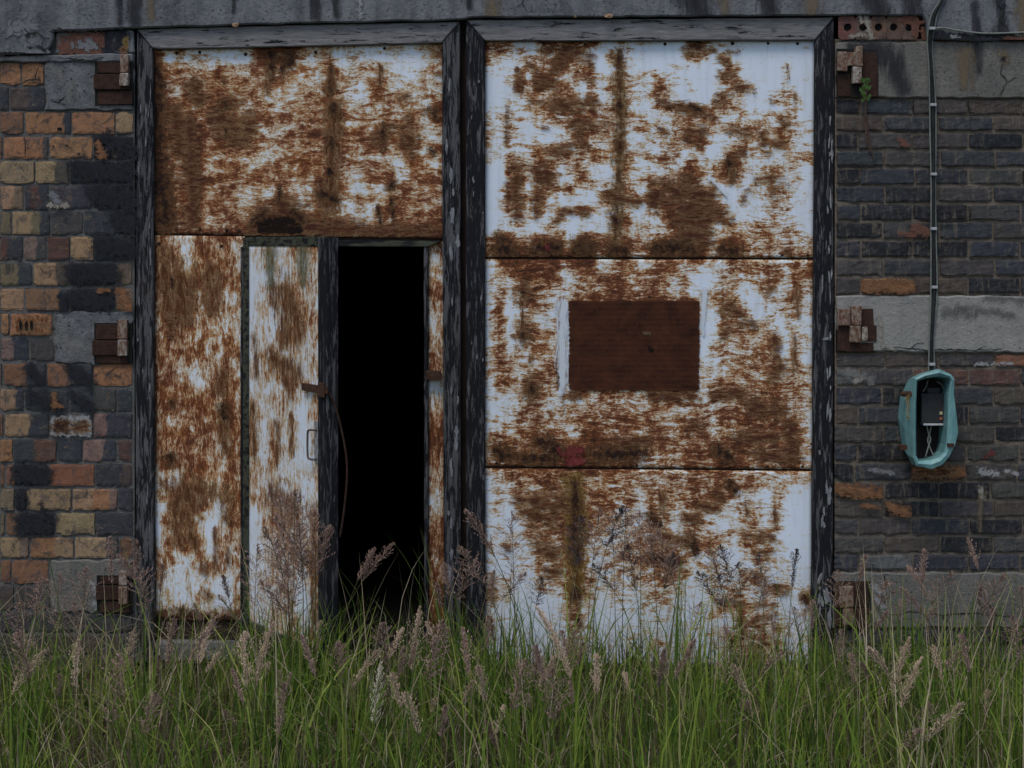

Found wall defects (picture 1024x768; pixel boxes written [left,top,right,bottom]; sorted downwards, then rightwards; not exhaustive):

rust [155,61,259,339]
rust [301,62,442,236]
rust [489,42,793,257]
water stain [847,37,911,96]
water stain [956,0,982,89]
water stain [996,0,1024,39]
rust [511,280,542,403]
rust [156,449,240,620]
rust [250,264,318,638]
rust [487,429,589,627]
rust [556,296,806,572]
rust [712,570,792,638]